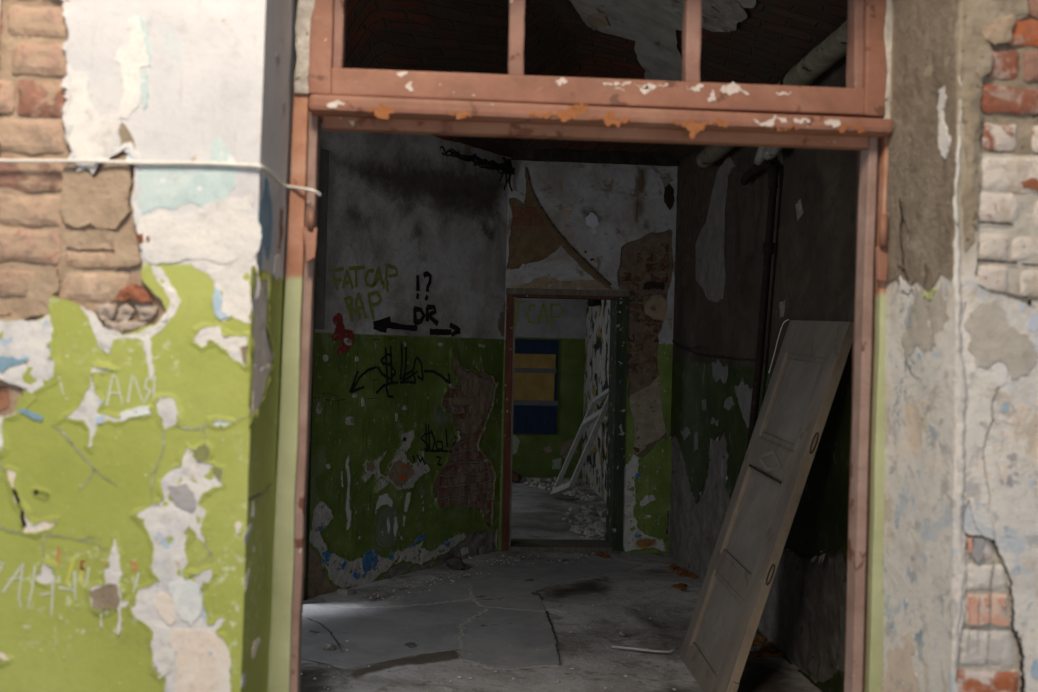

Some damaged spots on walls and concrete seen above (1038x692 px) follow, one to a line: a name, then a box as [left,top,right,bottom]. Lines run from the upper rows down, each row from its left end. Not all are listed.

flaking render [963,0,1038,379]
flaking render [0,0,186,540]
peeling [83,258,275,692]
crack [303,618,344,672]
peeling [360,405,431,494]
peeling [309,500,498,589]
crack [355,577,584,670]
flaking render [506,160,753,583]
flaking render [756,543,847,688]
flaking render [956,535,1021,692]